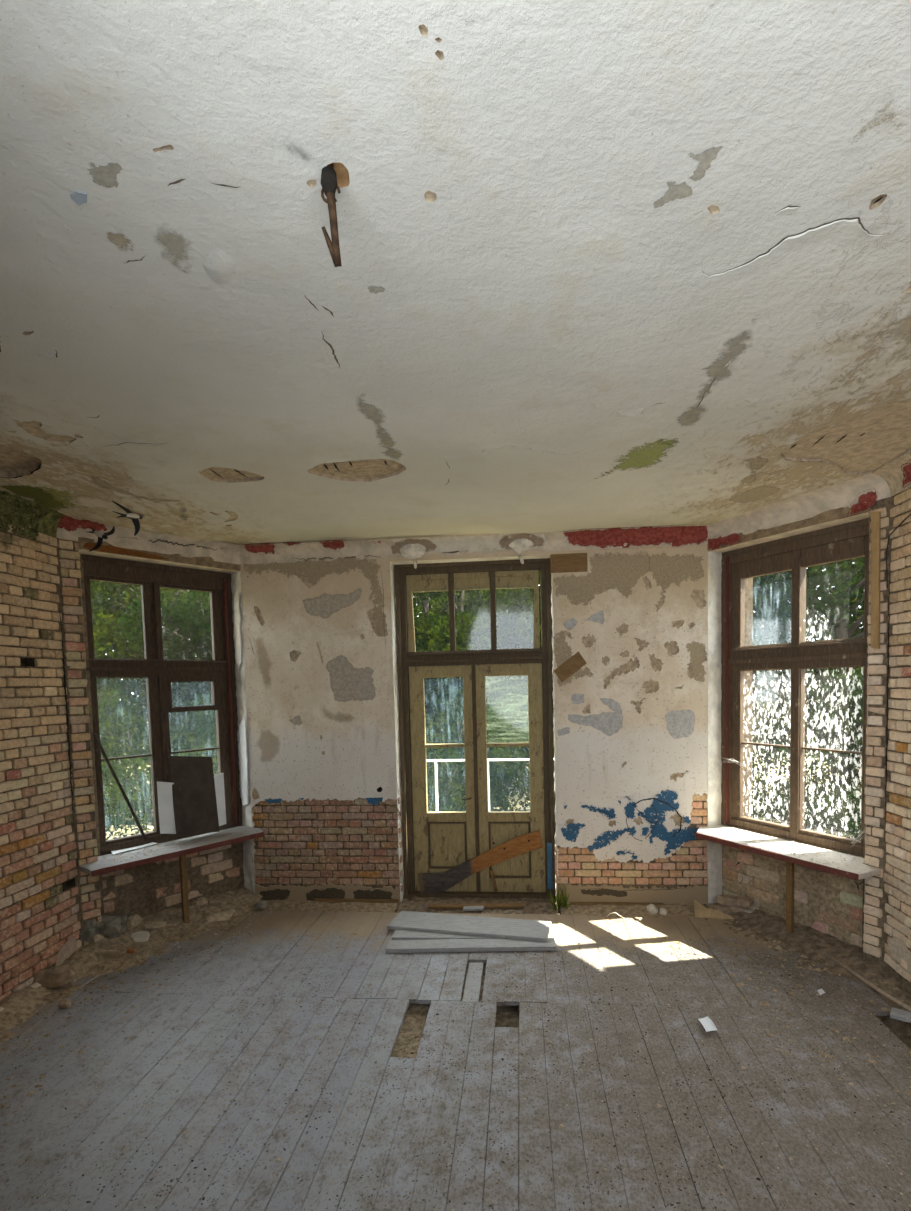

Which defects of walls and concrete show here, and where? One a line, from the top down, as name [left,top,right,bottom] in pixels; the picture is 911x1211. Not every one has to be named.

crack [687,206,890,290]
flaking render [0,443,42,478]
peeling [57,515,111,533]
peeling [840,489,878,519]
peeling [901,459,911,488]
peeling [241,540,388,640]
spalling [20,658,35,667]
peeling [233,593,265,671]
peeling [553,526,745,739]
flaking render [237,714,403,892]
flaking render [555,770,708,889]
spalling [62,878,75,891]